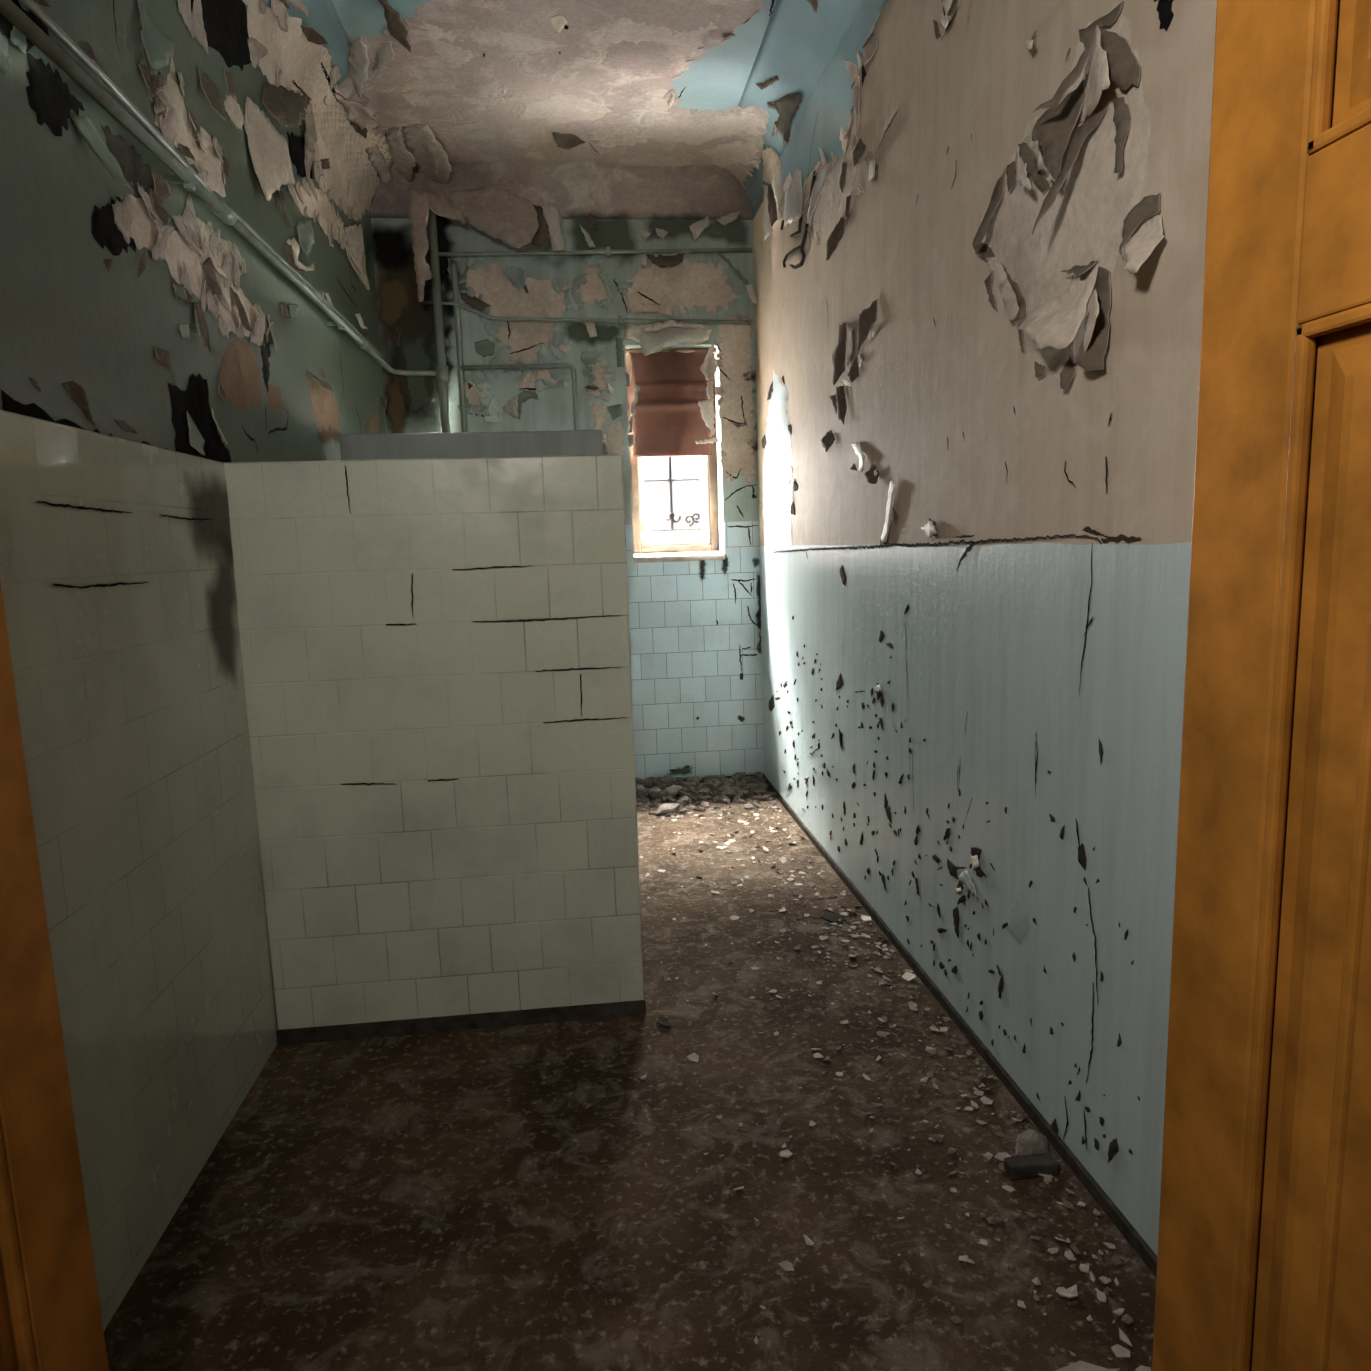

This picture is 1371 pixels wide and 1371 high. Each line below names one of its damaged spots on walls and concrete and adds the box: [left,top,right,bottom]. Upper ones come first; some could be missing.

peeling [933,0,961,40]
flaking render [1154,0,1174,31]
peeling [0,0,299,463]
peeling [138,0,898,337]
peeling [972,0,1165,390]
damp [194,485,234,669]
peeling [448,251,798,554]
peeling [820,299,899,544]
peeling [921,518,937,538]
peeling [769,644,1008,977]
peeling [966,965,1004,1021]
peeling [1068,1063,1133,1163]